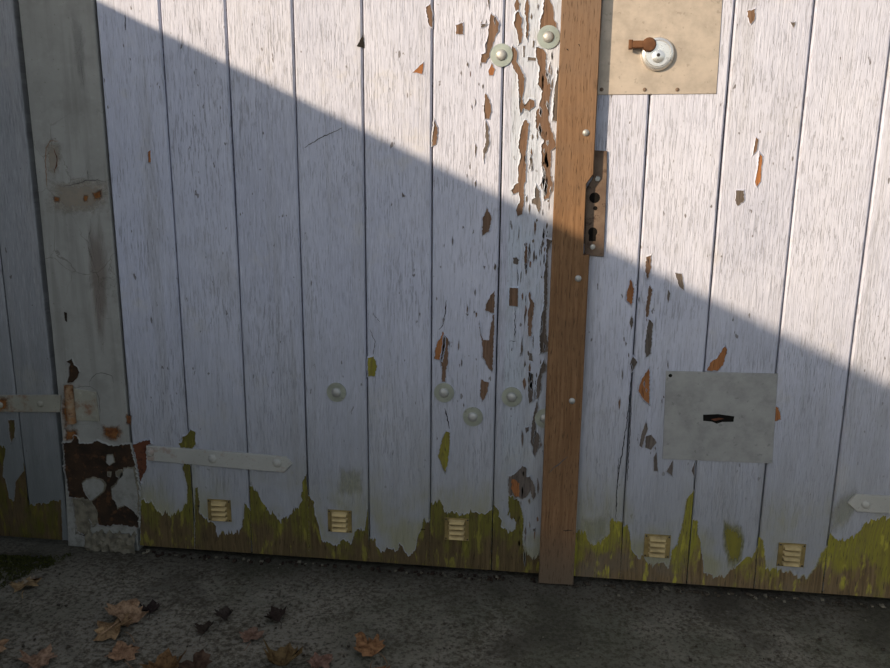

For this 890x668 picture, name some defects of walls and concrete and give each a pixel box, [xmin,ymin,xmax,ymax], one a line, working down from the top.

peeling [425,2,434,29]
peeling [431,118,439,147]
peeling [455,22,464,35]
peeling [466,0,501,165]
peeling [481,206,493,237]
peeling [508,0,559,457]
peeling [734,136,764,207]
peeling [433,300,463,383]
peeling [466,288,496,403]
peeling [621,253,664,407]
peeling [139,464,539,573]
peeling [574,489,890,598]